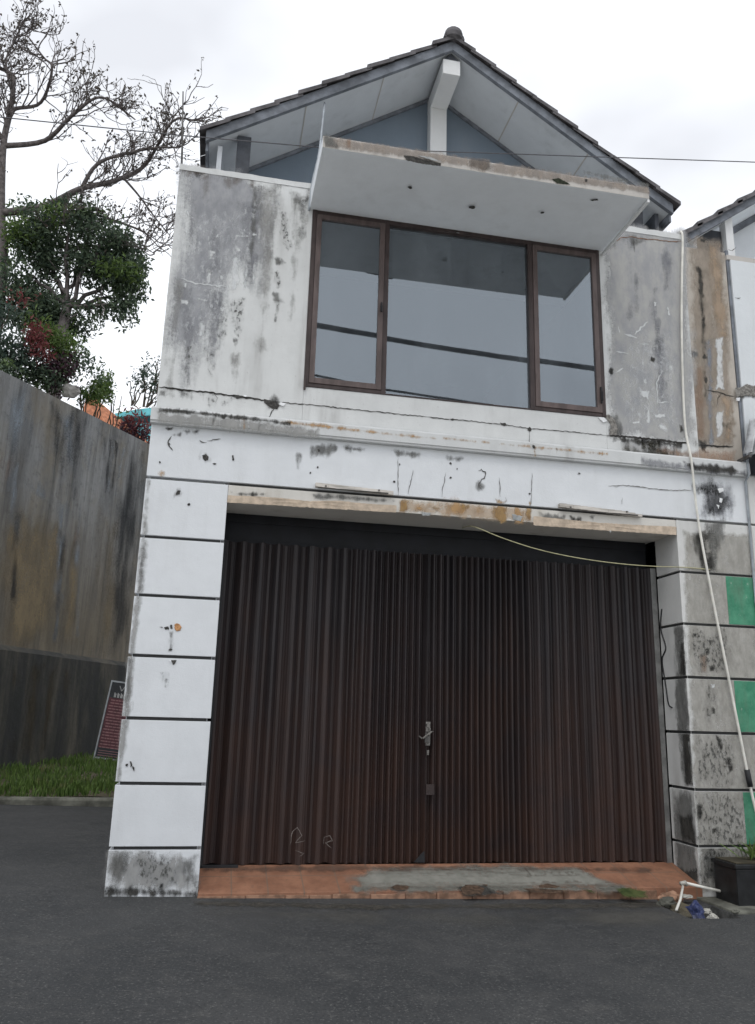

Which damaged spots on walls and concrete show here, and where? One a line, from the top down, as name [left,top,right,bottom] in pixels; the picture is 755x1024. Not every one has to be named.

spalling [404,155,441,166]
damp [169,170,288,358]
peeling [716,338,755,401]
damp [159,398,361,474]
crack [159,386,733,453]
peeling [227,492,677,535]
damp [7,519,78,641]
damp [606,226,755,890]
damp [106,466,146,779]
damp [104,852,197,897]
spalling [459,884,502,896]
spalling [525,884,568,893]